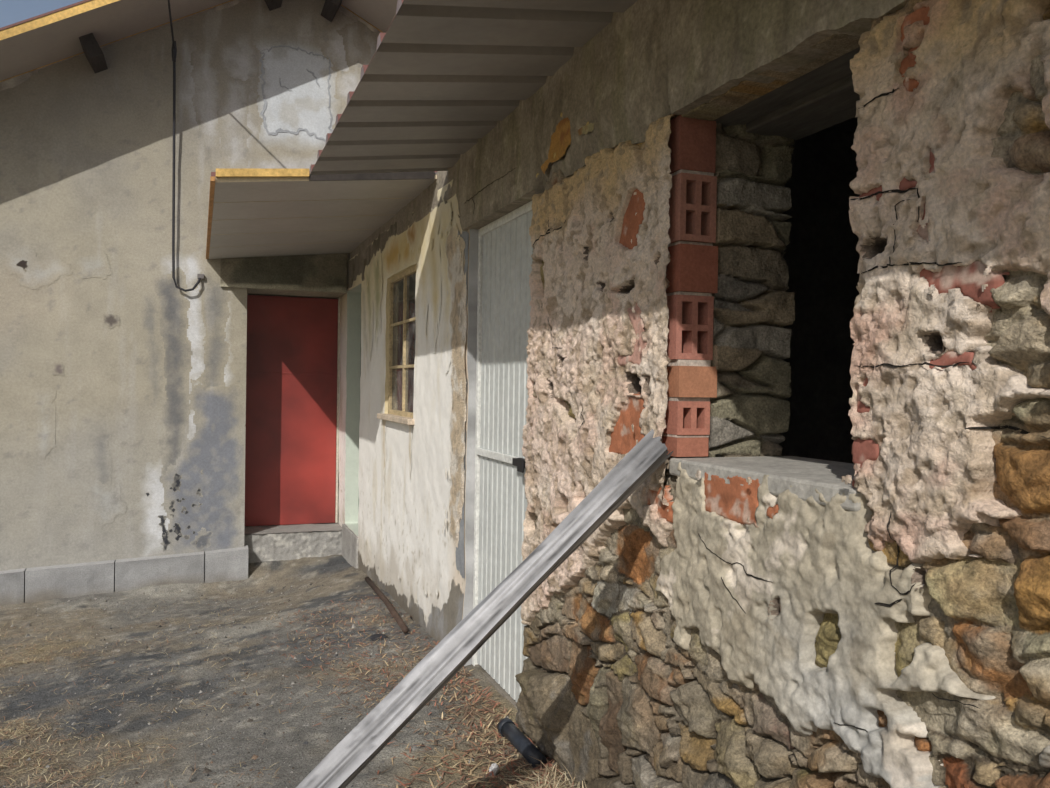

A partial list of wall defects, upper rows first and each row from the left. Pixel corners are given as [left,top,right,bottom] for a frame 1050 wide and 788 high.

crack [858,88,899,109]
flaking render [618,189,645,250]
leakage [4,245,112,290]
flaking render [920,261,1010,313]
crack [856,361,969,369]
leakage [88,249,244,558]
flaking render [348,200,467,642]
flaking render [605,392,645,455]
flaking render [841,438,879,488]
flaking render [637,485,673,523]
flaking render [695,469,779,527]
crack [698,534,771,611]